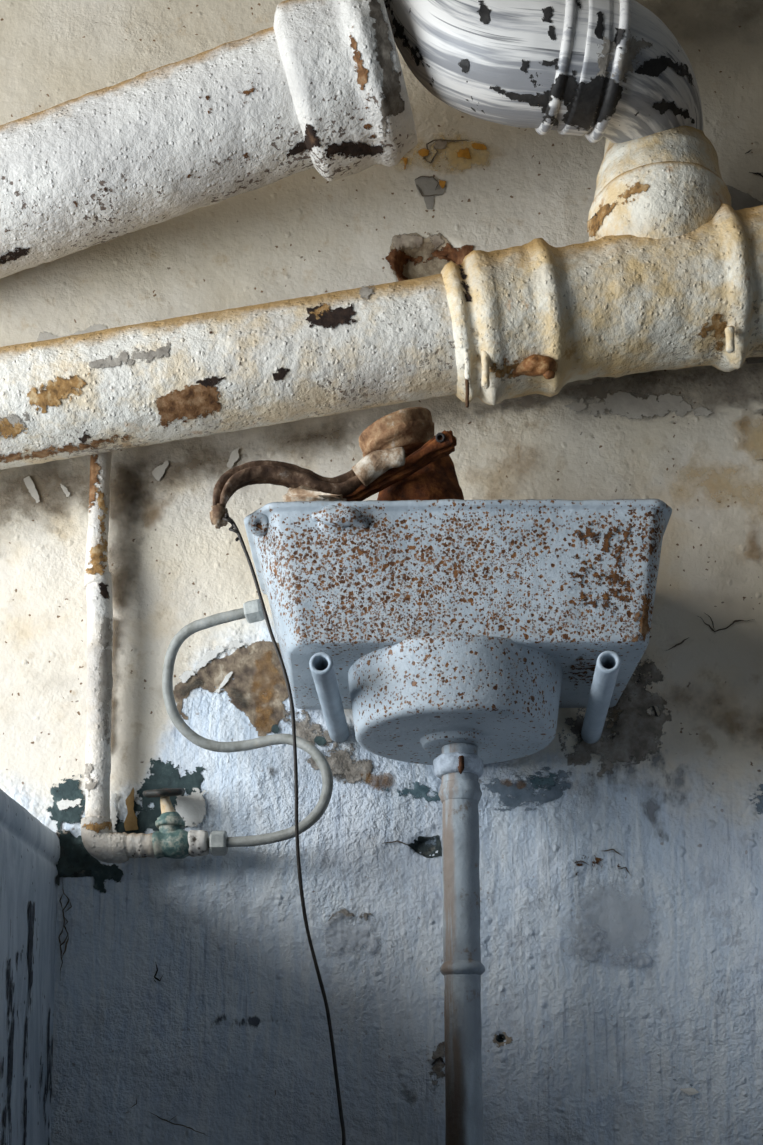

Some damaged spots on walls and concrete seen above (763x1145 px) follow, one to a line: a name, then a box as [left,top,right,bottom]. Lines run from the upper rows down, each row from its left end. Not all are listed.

spalling [385,231,475,302]
peeling [173,640,440,802]
peeling [482,659,672,811]
peeling [47,774,132,893]
peeling [110,758,209,834]
flaking render [645,800,662,837]